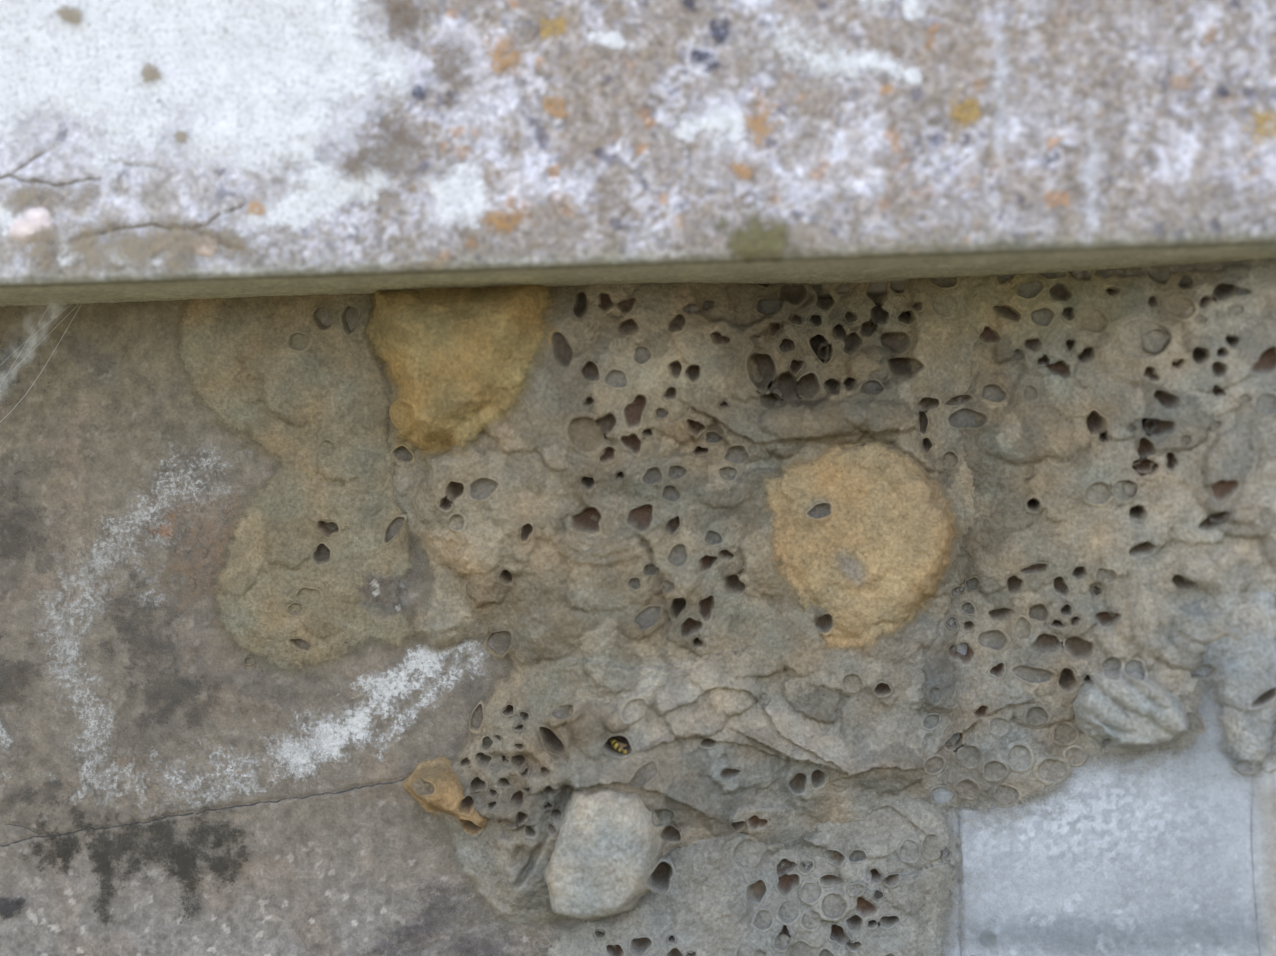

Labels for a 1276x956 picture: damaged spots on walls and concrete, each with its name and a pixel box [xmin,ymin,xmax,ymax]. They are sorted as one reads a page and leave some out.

crack [0,147,164,196]
crack [95,205,242,248]
leakage [0,442,483,925]
crack [0,776,408,847]